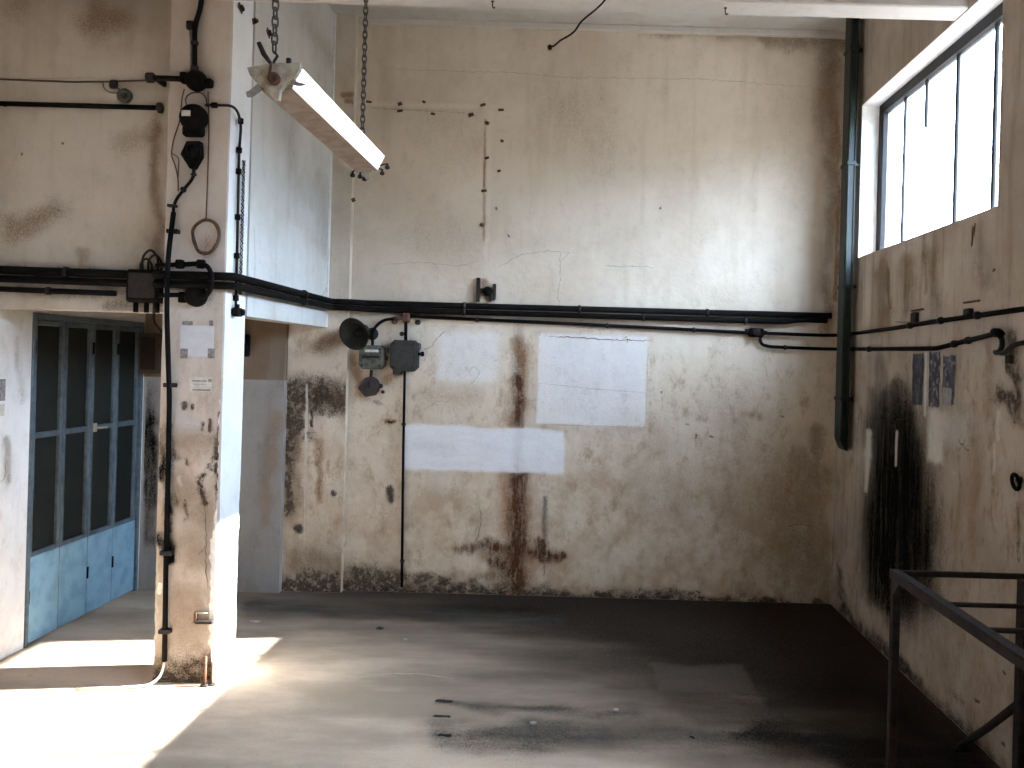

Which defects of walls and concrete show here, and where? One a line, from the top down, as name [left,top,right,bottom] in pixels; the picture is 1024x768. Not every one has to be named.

leakage [210,410,220,503]
leakage [252,327,346,531]
corrosion [499,334,536,429]
crack [555,335,649,343]
leakage [982,325,1024,428]
corrosion [451,459,569,595]
leakage [282,382,1009,768]